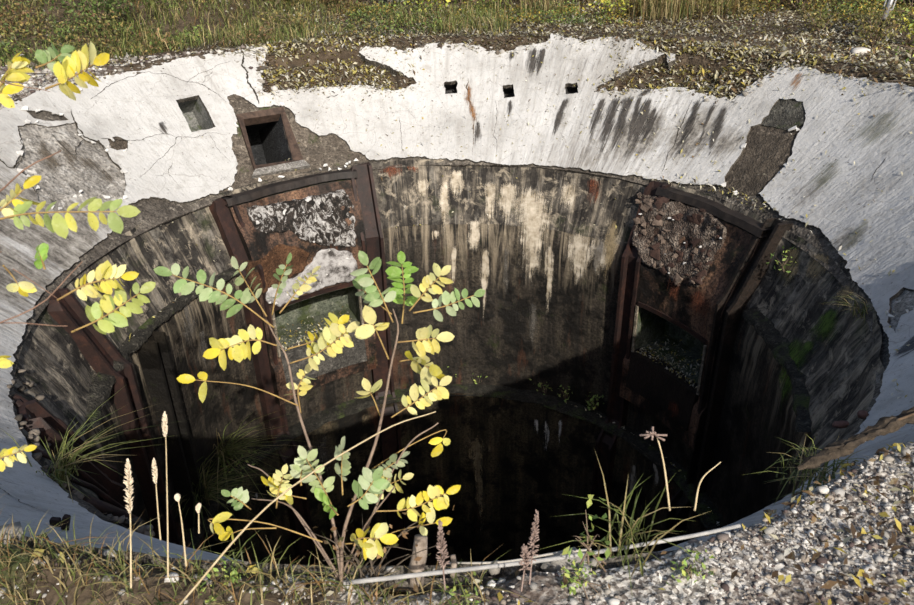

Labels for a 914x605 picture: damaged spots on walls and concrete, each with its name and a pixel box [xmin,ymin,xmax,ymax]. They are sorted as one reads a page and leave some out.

crack [91,52,259,103]
spalling [14,79,132,210]
crack [51,111,223,180]
spalling [133,44,369,192]
water stain [553,99,568,133]
water stain [590,89,658,153]
water stain [677,100,727,155]
spalling [720,126,800,196]
water stain [432,170,463,239]
corrosion [241,244,310,293]
water stain [468,183,554,308]
spalling [535,547,601,573]